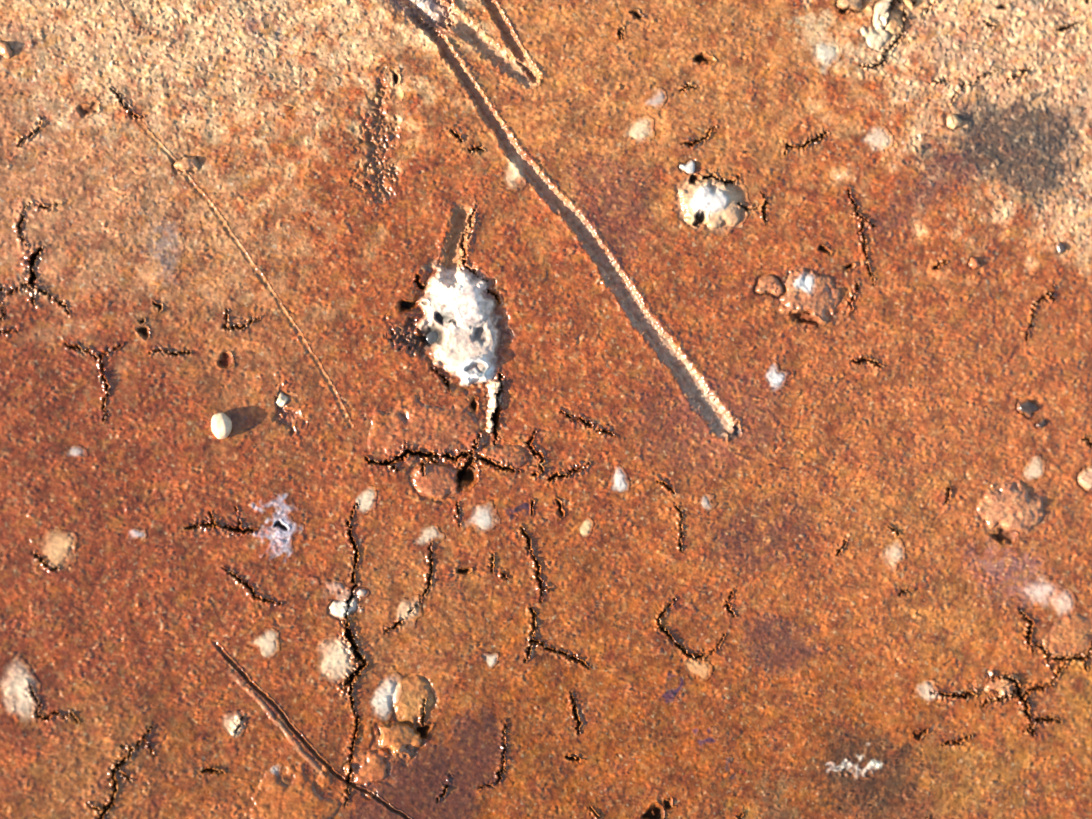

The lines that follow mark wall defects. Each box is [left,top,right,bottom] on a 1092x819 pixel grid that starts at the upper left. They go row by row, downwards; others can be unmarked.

crack [0,201,70,334]
crack [64,342,191,424]
crack [364,372,591,528]
crack [184,506,258,534]
crack [657,480,684,553]
crack [222,567,282,606]
crack [341,503,368,807]
crack [383,543,434,635]
crack [521,526,591,670]
crack [657,591,736,660]
crack [930,608,1092,738]
crack [565,692,585,761]